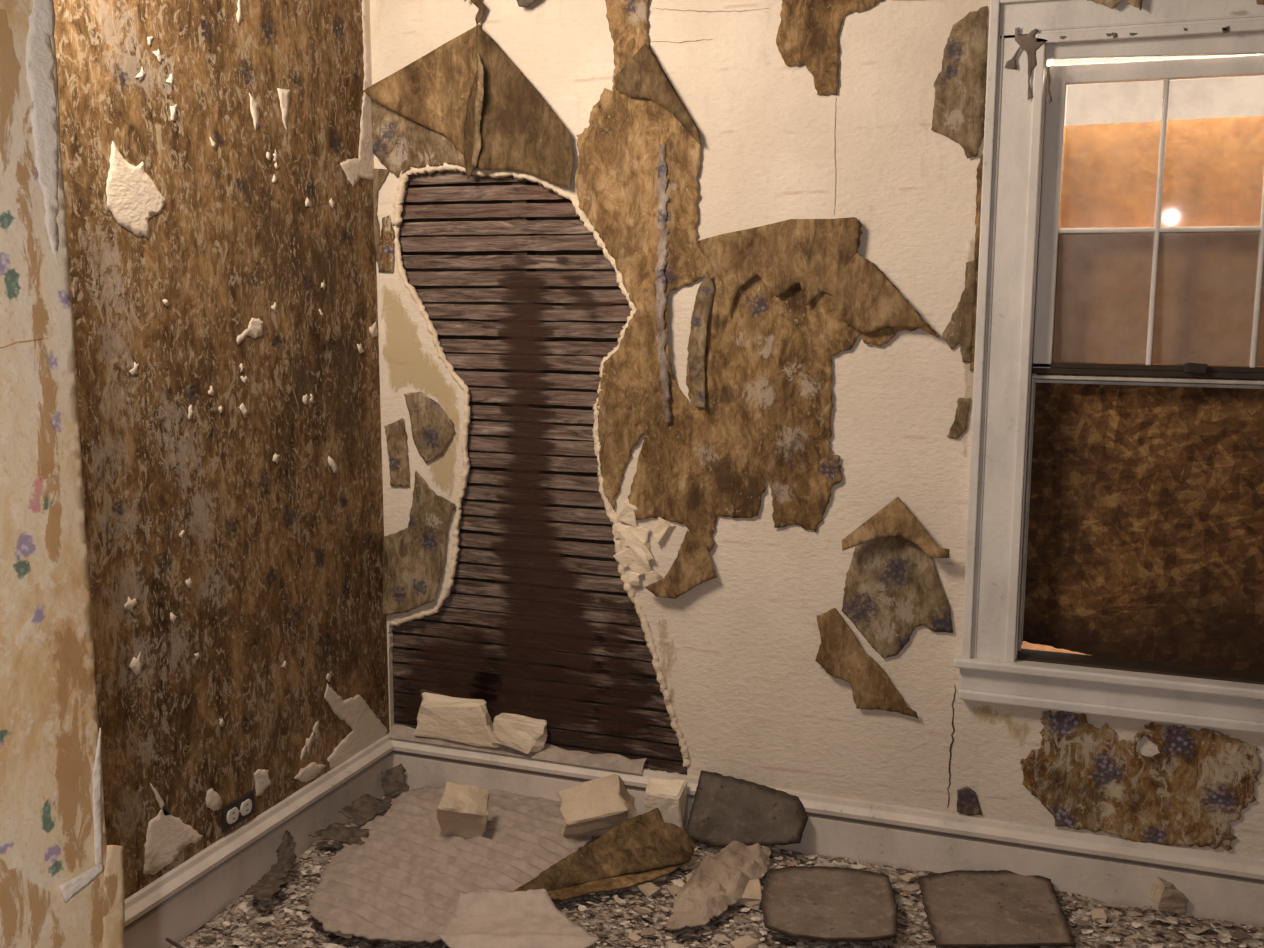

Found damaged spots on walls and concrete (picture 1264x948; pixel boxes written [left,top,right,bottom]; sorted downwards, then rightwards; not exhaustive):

flaking render [106,141,166,239]
flaking render [294,0,691,783]
leakage [396,254,654,749]
flaking render [143,783,203,875]
flaking render [205,788,222,811]
flaking render [253,769,271,797]
crack [947,685,956,808]